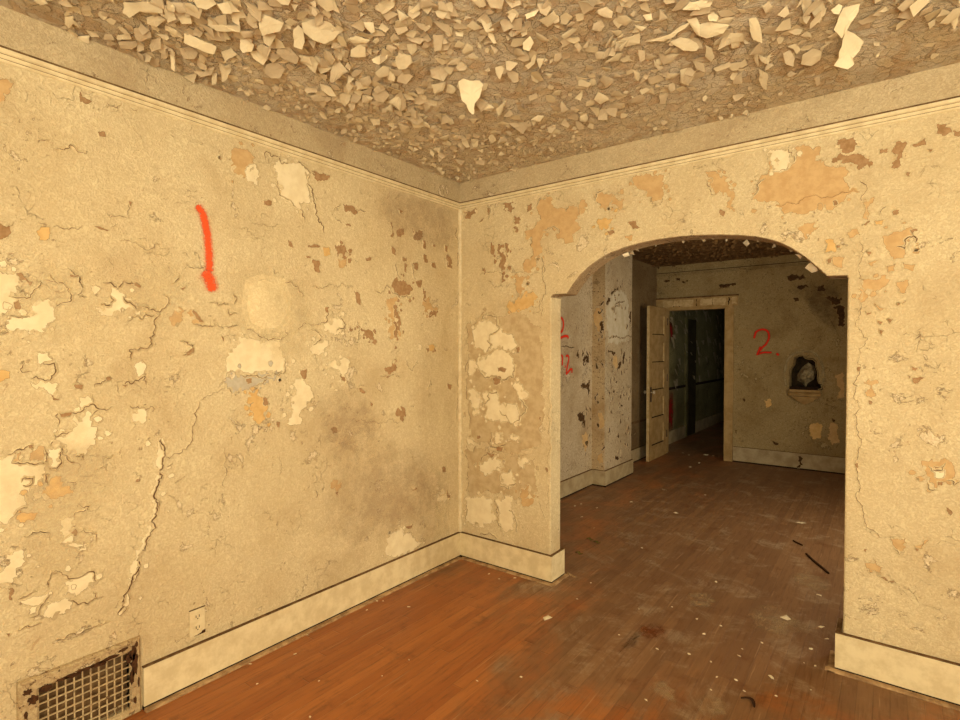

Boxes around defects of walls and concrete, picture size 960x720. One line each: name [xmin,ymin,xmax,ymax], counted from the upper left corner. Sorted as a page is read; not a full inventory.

peeling [216,140,366,233]
peeling [25,0,960,184]
crack [114,386,225,618]
peeling [0,208,452,637]
peeling [433,122,960,540]